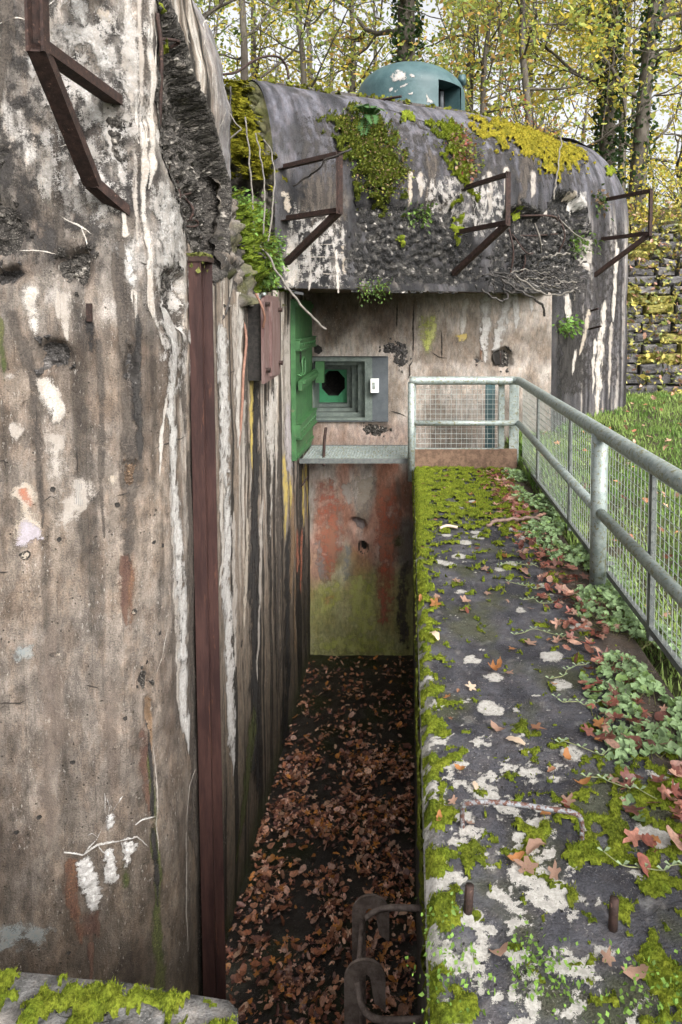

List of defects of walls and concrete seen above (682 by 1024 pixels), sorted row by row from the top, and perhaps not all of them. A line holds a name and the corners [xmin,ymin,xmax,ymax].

spalling [154,0,232,286]
spalling [0,193,35,285]
spalling [53,241,99,296]
spalling [342,187,593,295]
spalling [34,334,76,377]
spalling [378,337,412,373]
spalling [474,346,512,373]
damp [0,0,198,859]
peeling [10,479,44,547]
rust [118,555,135,630]
damp [215,304,410,861]
damp [64,720,167,990]